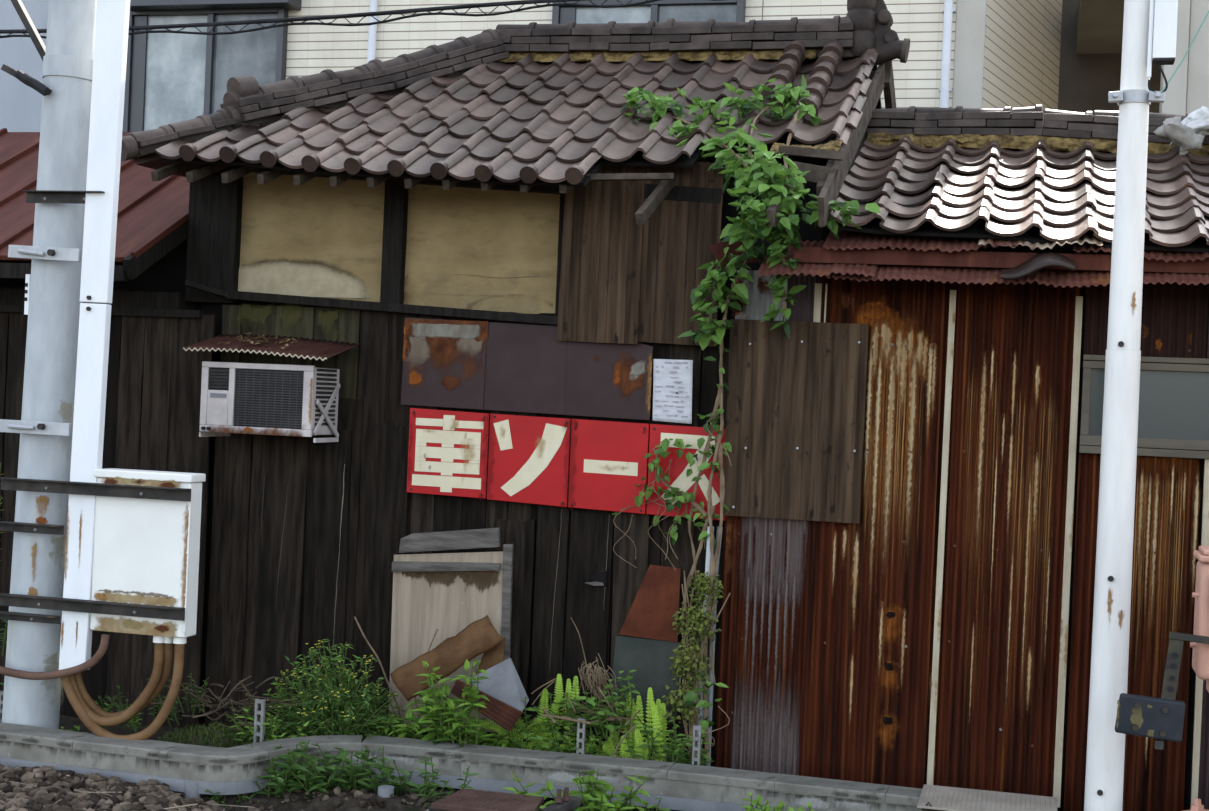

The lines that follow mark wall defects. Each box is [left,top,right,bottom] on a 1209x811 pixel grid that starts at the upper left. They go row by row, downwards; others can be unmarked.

water stain [237,260,365,340]
corrosion [613,355,652,412]
corrosion [103,477,180,488]
corrosion [94,507,189,608]
corrosion [1107,456,1200,686]
corrosion [95,618,176,637]
corrosion [879,721,894,748]